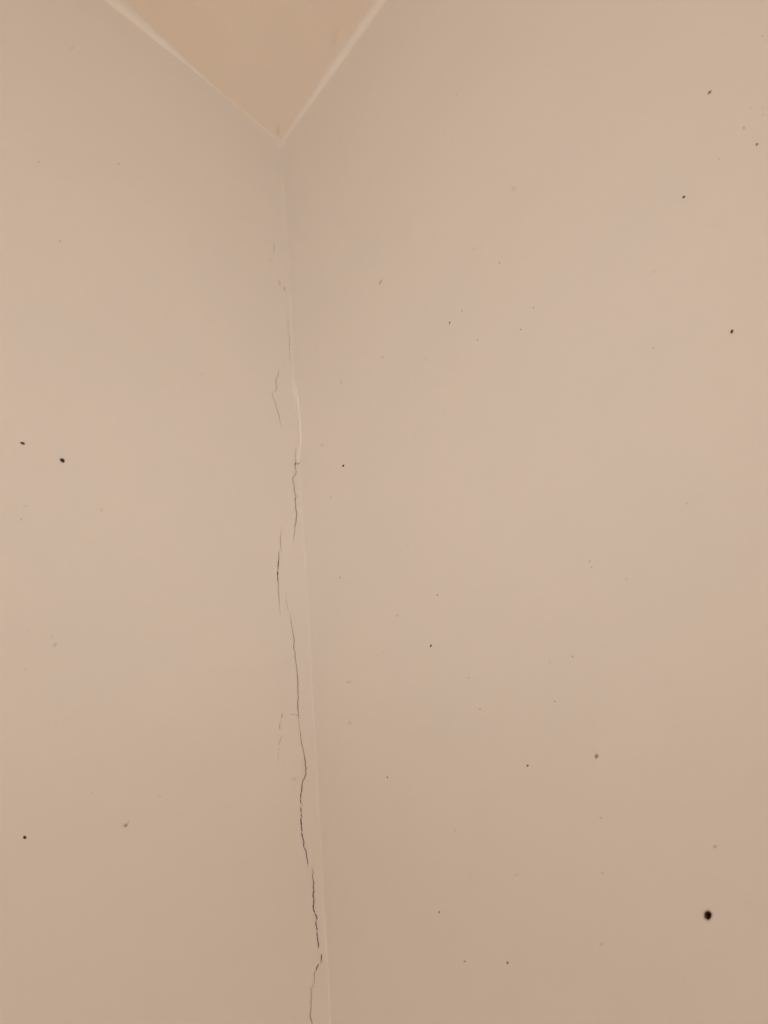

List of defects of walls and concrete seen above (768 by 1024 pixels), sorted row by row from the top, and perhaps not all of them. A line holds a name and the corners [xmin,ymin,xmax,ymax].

crack [297,674,322,974]